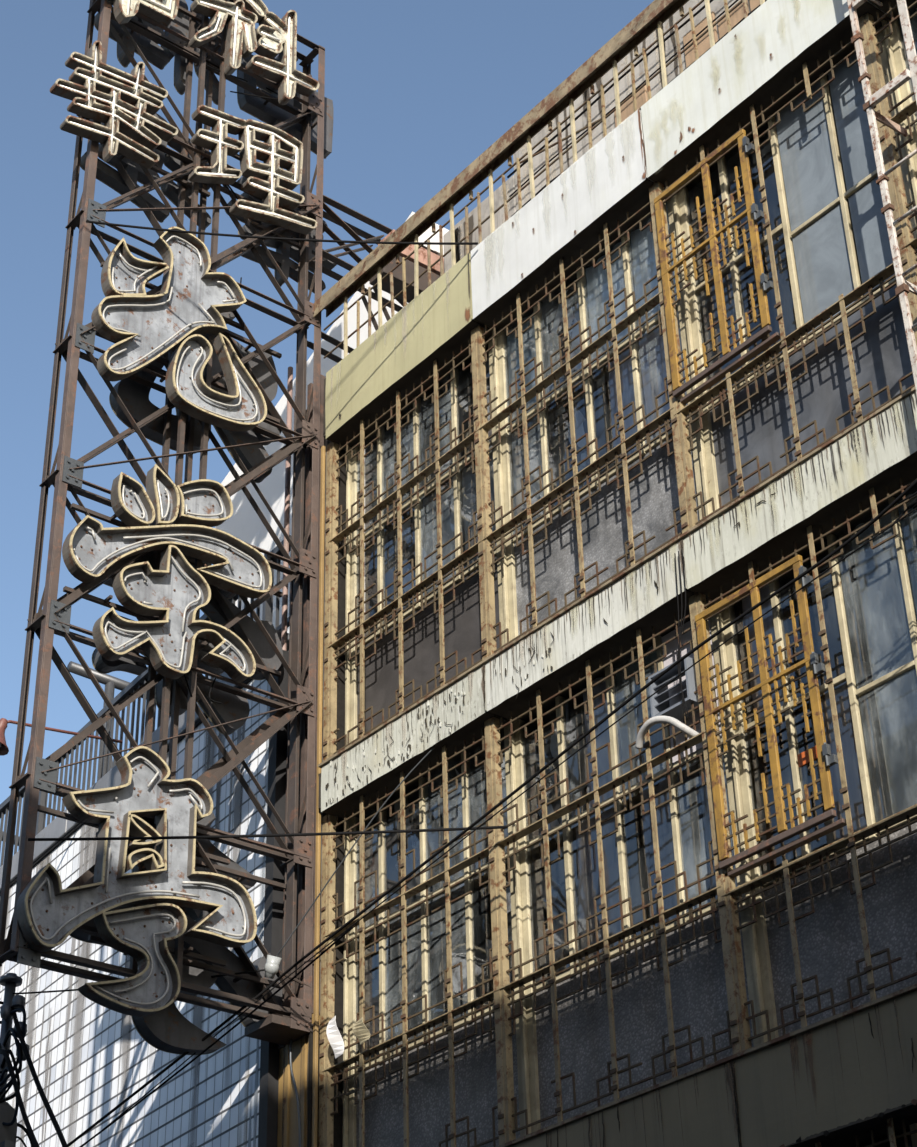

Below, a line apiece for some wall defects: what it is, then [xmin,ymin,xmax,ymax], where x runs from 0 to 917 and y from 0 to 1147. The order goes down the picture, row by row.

damp [630,15,678,87]
damp [556,78,602,167]
damp [333,391,917,778]
peeling [495,633,554,698]
peeling [325,688,465,806]